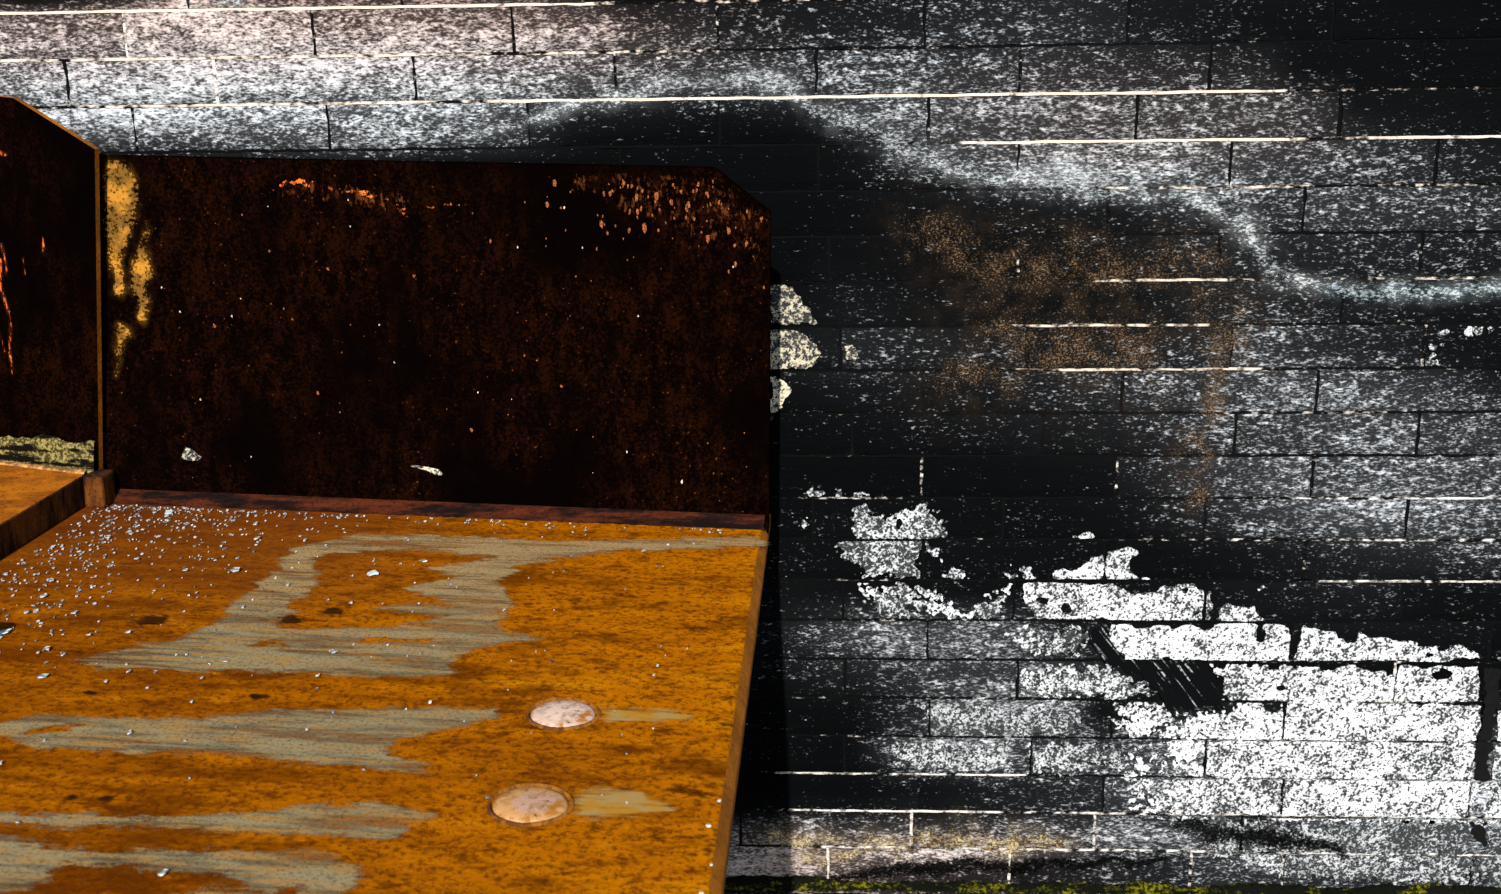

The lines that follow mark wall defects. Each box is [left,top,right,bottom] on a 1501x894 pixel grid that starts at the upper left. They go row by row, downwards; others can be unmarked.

damp [530,80,707,120]
corrosion [546,177,763,273]
damp [726,73,1501,300]
peeling [1425,326,1499,366]
peeling [803,485,1501,887]
damp [1473,667,1501,782]
damp [1469,821,1488,850]